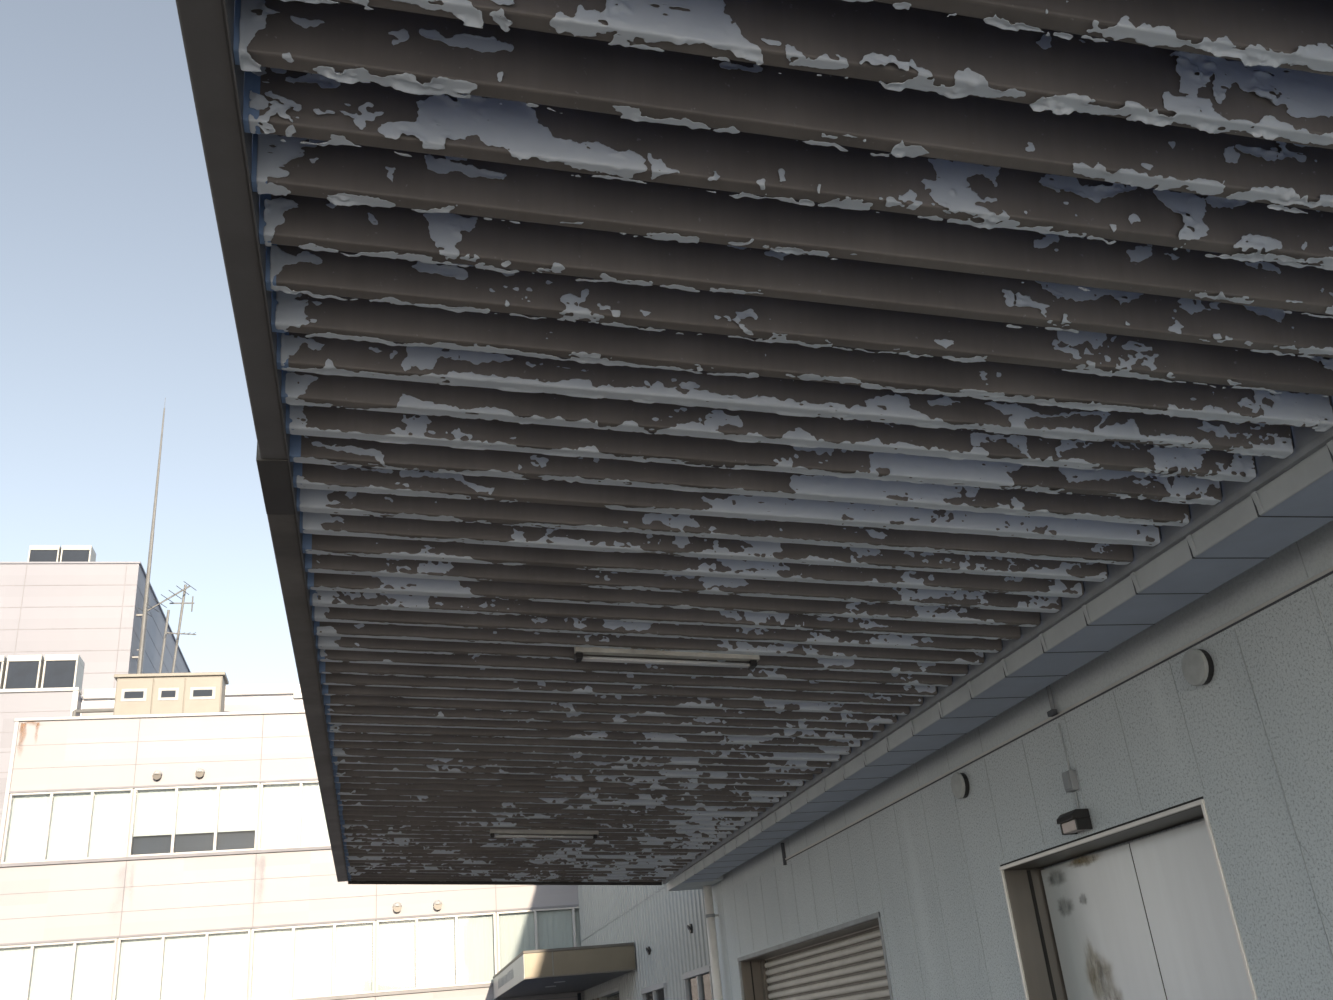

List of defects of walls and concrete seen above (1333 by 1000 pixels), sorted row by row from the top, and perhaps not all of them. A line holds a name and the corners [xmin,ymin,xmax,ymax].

peeling [239,0,1333,882]